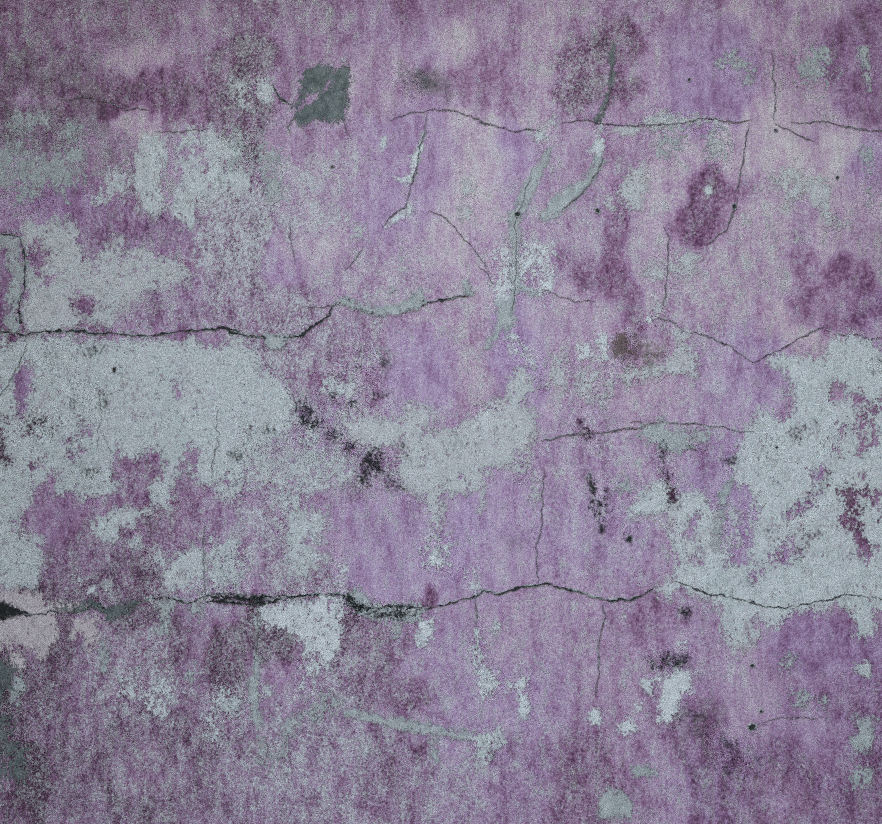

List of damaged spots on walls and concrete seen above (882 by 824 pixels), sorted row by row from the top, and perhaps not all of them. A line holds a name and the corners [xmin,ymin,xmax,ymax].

crack [0,233,469,396]
spalling [225,61,356,127]
crack [383,109,606,350]
crack [561,43,751,245]
crack [651,225,882,363]
peeling [769,154,854,239]
peeling [0,99,712,793]
crack [544,421,756,441]
peeling [614,324,882,660]
crack [0,467,882,726]
peeling [596,787,635,824]
peeling [841,710,880,794]